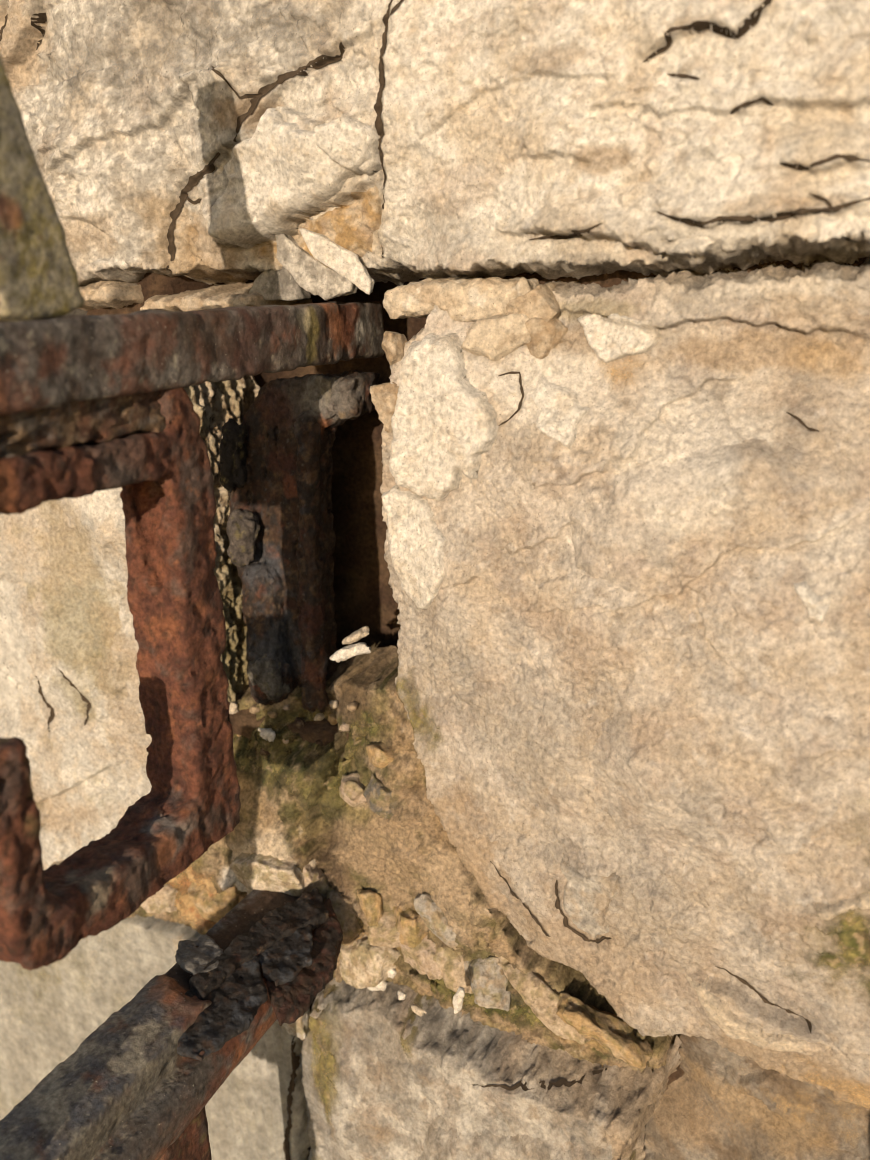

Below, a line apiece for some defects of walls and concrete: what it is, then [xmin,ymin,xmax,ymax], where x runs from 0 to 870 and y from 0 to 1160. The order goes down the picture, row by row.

crack [643,0,772,80]
crack [374,0,404,209]
crack [166,42,345,280]
corrosion [0,391,167,459]
corrosion [169,867,218,922]
crack [473,1068,607,1091]